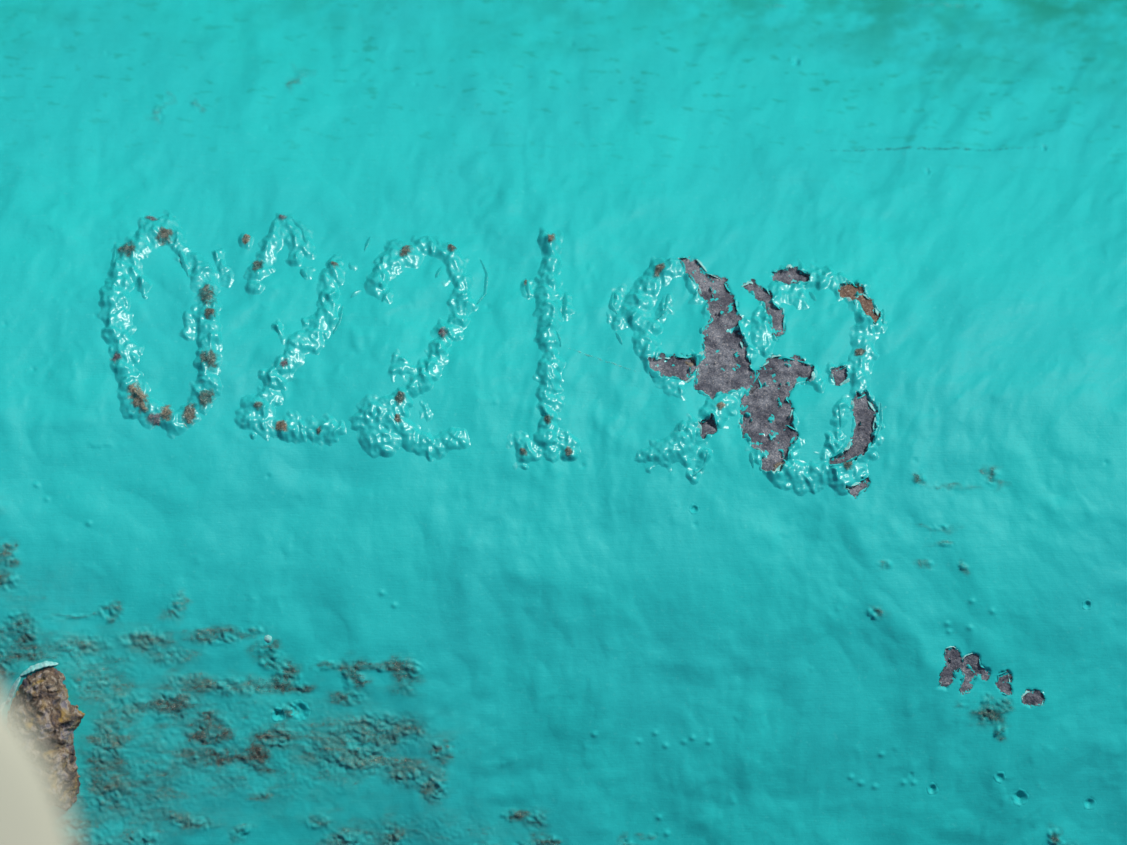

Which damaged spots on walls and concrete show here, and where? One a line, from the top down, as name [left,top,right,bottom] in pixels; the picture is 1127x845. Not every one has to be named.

rust [147,216,173,243]
rust [201,285,214,319]
peeling [838,282,885,325]
rust [200,350,217,367]
peeling [648,256,816,477]
rust [129,383,214,426]
peeling [829,365,883,467]
peeling [845,473,871,498]
rust [274,665,311,692]
peeling [939,646,1045,706]
rust [191,712,290,771]